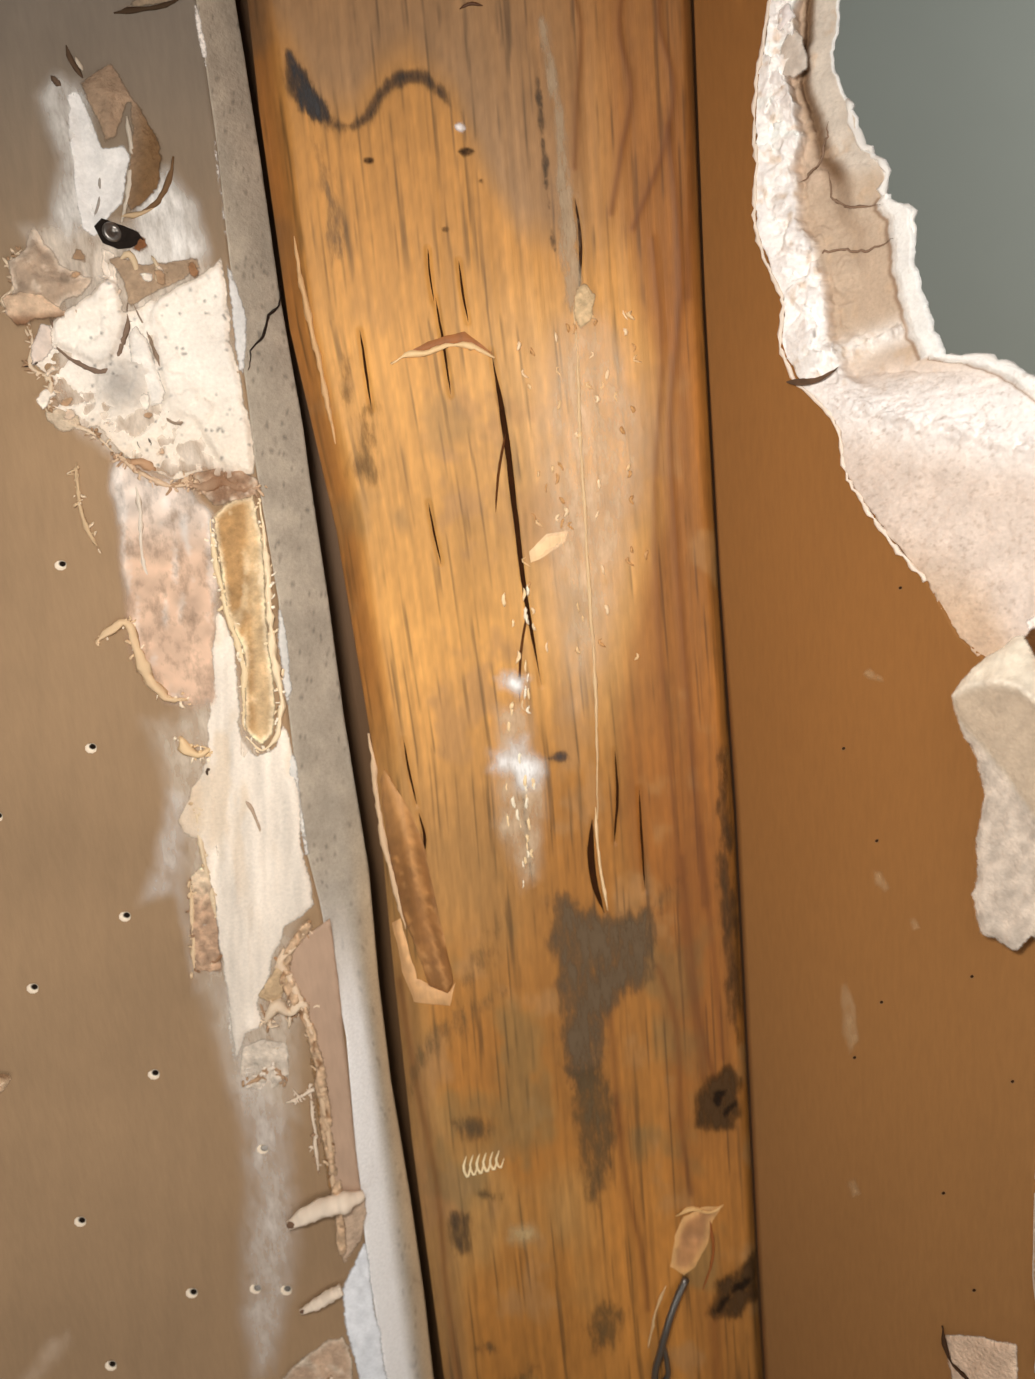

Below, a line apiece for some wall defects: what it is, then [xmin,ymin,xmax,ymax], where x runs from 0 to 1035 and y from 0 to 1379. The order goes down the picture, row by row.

leakage [287,51,445,128]
spalling [0,227,255,496]
crack [428,252,468,393]
spalling [751,0,1035,657]
crack [492,358,541,701]
spalling [178,610,314,1057]
spalling [380,769,455,1006]
leakage [550,896,654,1197]
peeling [287,1190,365,1230]
crack [941,1325,969,1379]